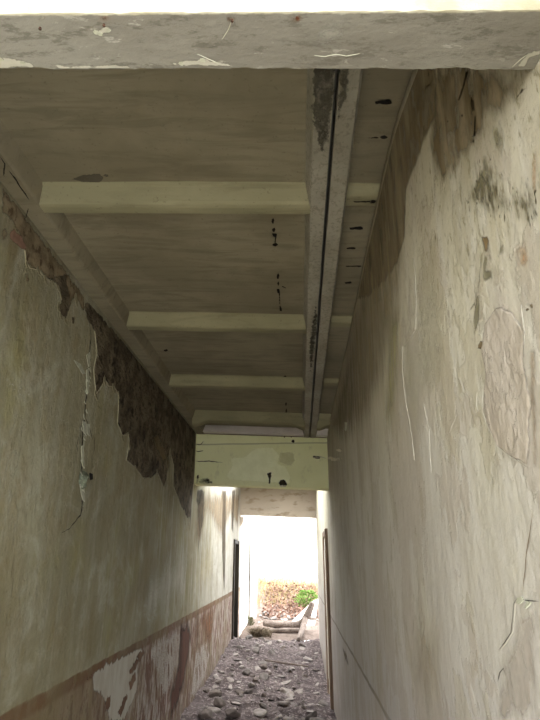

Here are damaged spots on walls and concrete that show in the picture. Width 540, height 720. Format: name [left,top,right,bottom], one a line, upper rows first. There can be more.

peeling [173,58,230,66]
water stain [311,68,348,151]
water stain [338,67,511,430]
flaking render [2,189,195,528]
crack [62,323,95,533]
crack [500,512,538,650]
peeling [87,631,180,720]